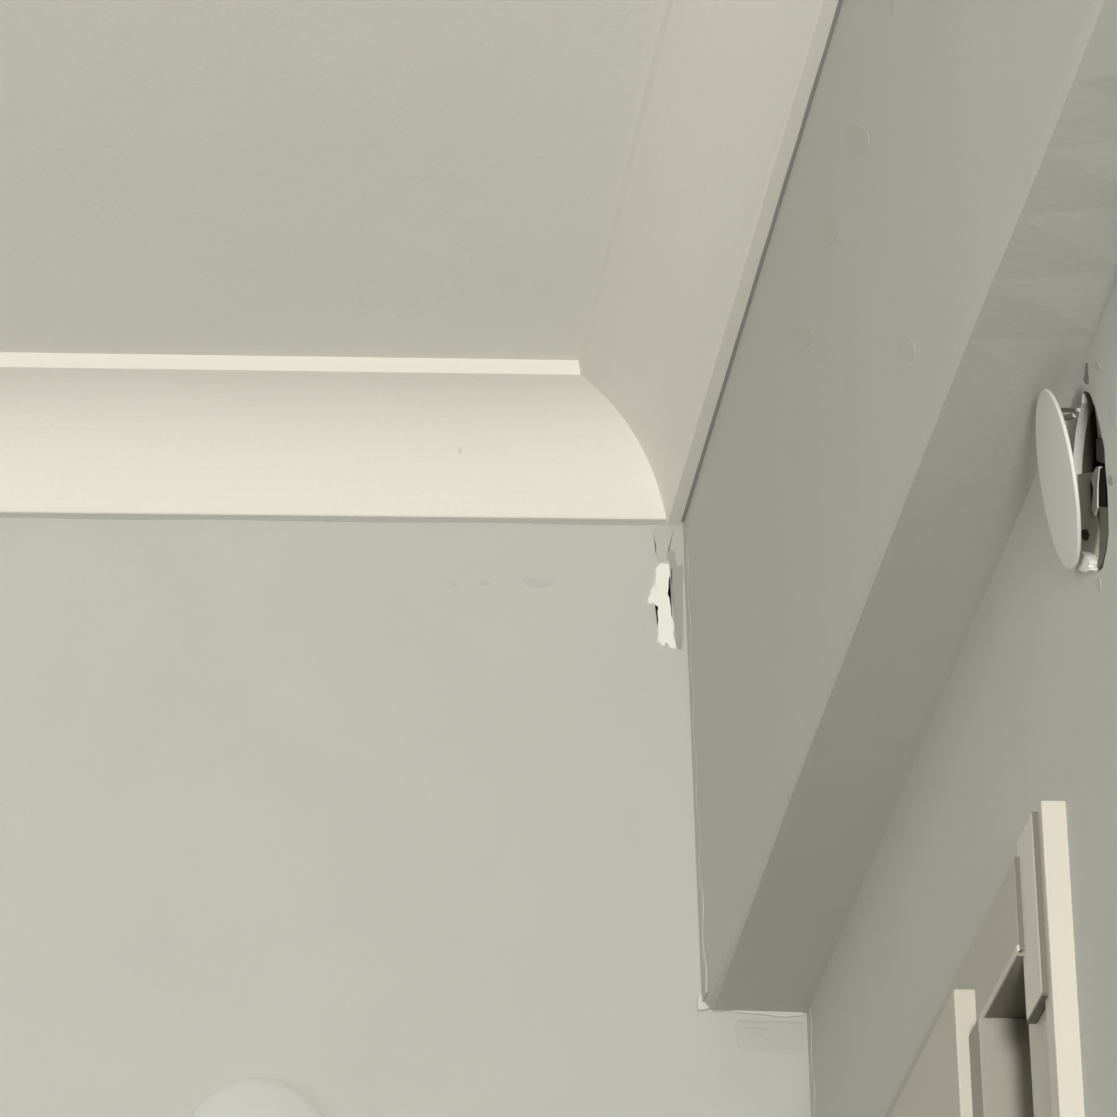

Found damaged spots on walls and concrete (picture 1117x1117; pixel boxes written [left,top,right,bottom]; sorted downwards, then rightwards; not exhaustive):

spalling [647,563,676,650]